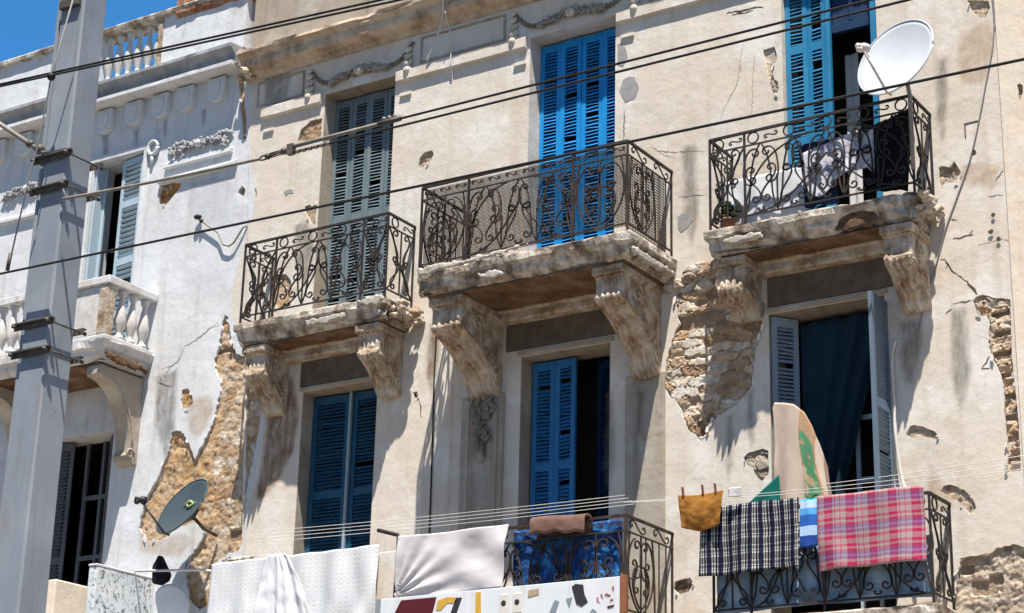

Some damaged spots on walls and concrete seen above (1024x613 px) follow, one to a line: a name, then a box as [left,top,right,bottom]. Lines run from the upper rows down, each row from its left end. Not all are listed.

peeling [764,47,779,96]
spalling [420,151,434,169]
spalling [158,183,181,205]
spalling [902,159,962,223]
crack [158,326,214,386]
spalling [629,244,765,442]
spalling [974,296,1021,474]
spalling [140,316,262,609]
spalling [744,449,769,481]
spalling [907,425,939,440]
spalling [942,485,976,514]
spalling [953,545,1024,613]